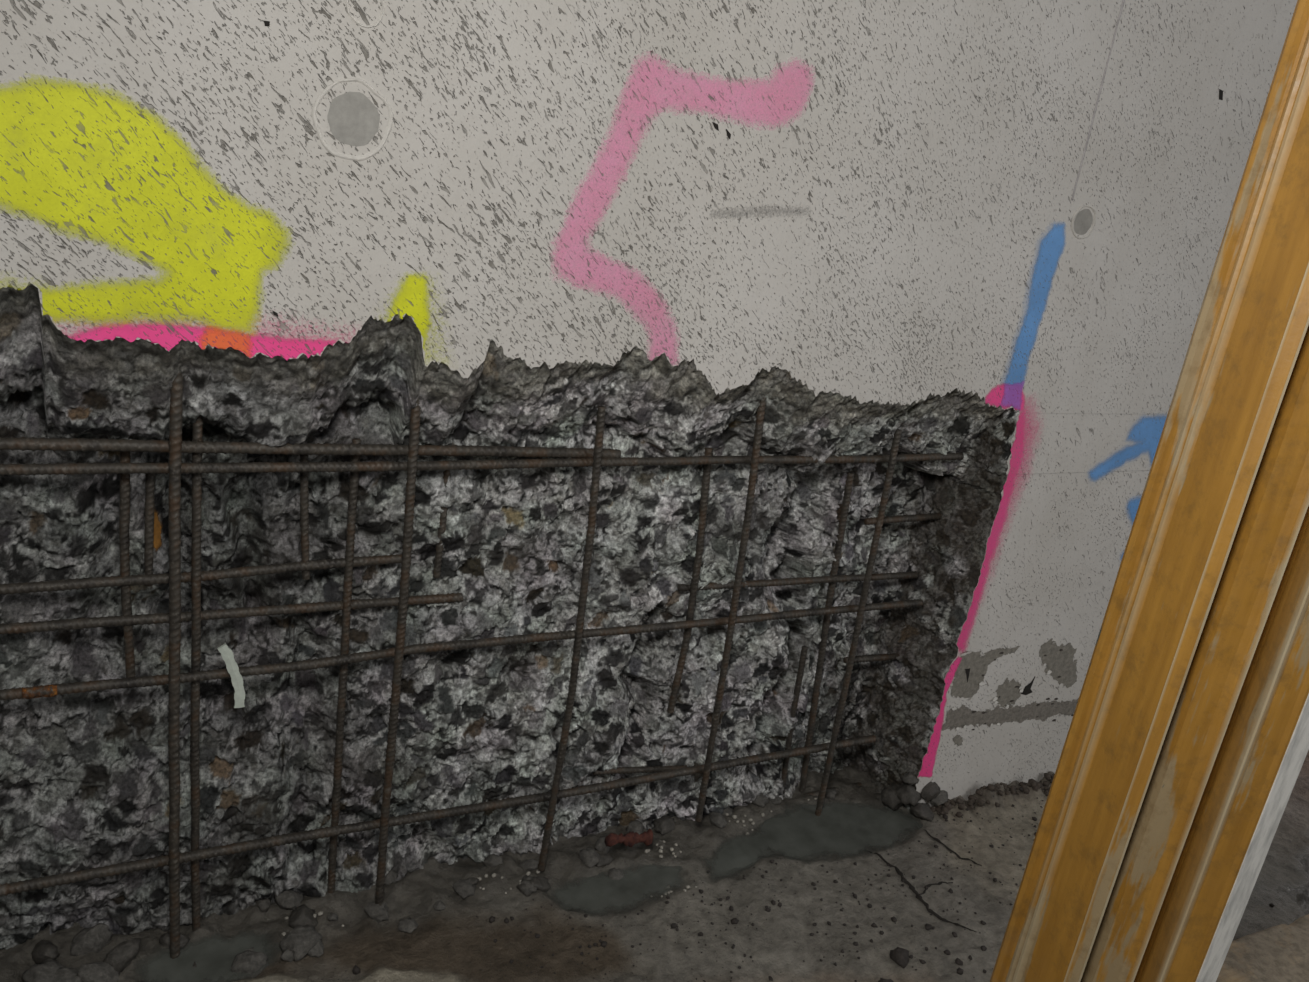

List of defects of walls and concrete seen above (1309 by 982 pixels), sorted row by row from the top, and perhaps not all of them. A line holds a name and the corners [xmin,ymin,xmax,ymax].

spalling [0,283,1079,959]
crack [919,881,953,895]